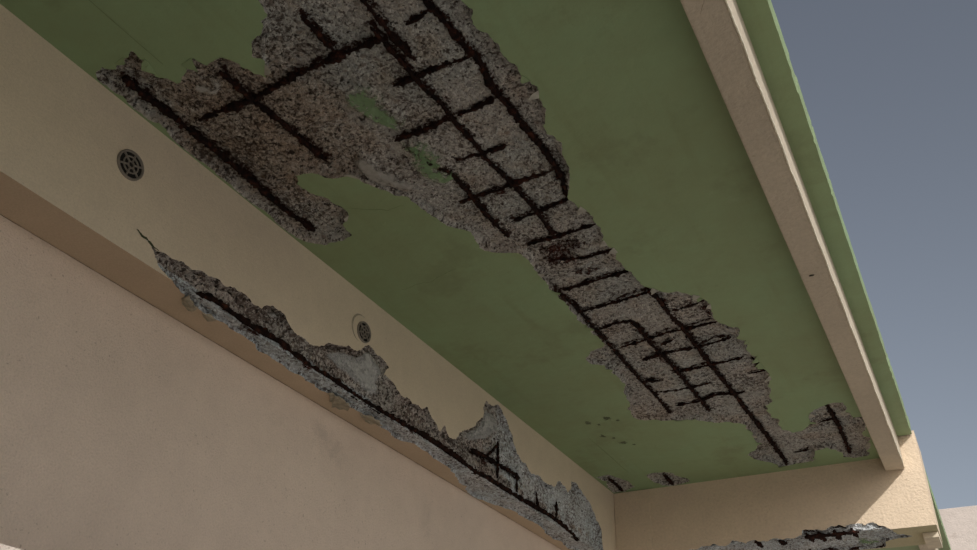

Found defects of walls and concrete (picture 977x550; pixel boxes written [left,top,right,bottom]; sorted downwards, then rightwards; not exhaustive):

spalling [96,0,871,468]
spalling [137,229,603,550]
spalling [596,475,635,493]
spalling [646,472,689,486]
spalling [689,522,911,550]